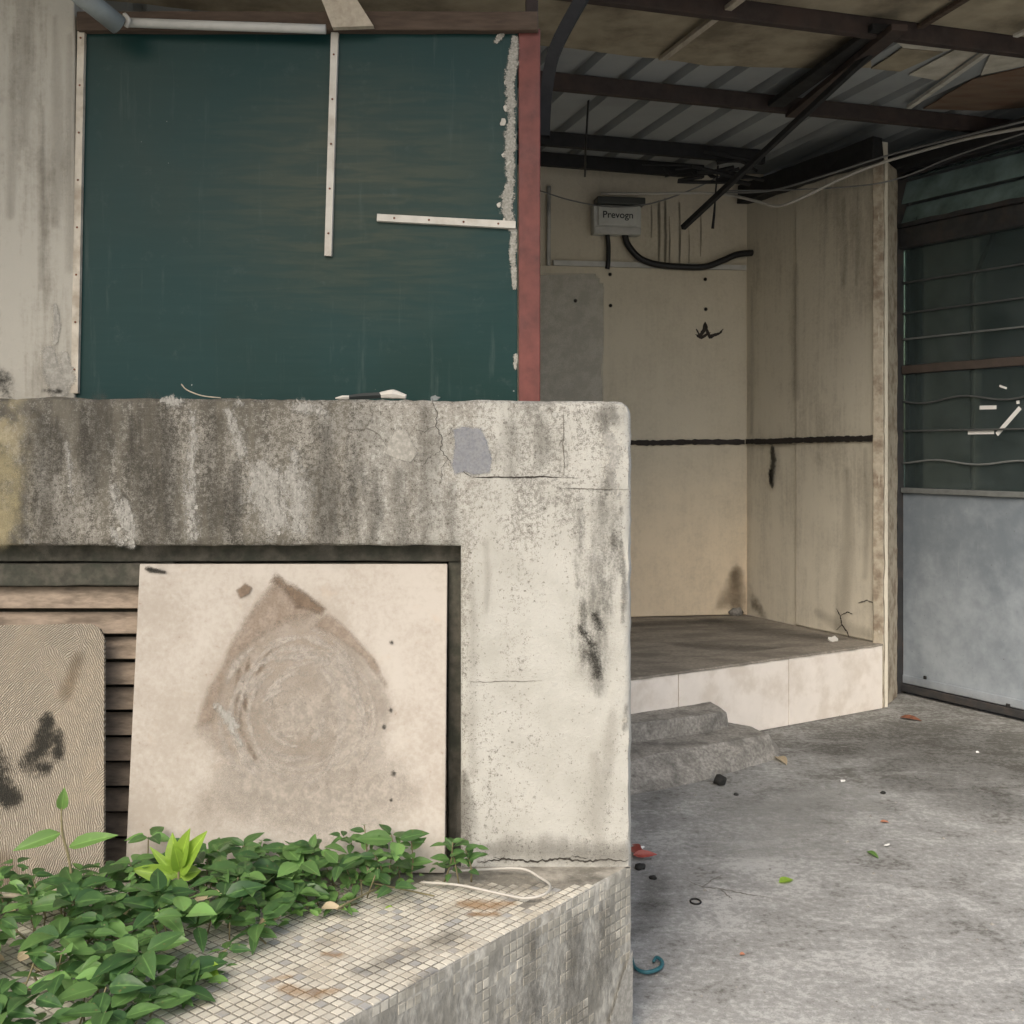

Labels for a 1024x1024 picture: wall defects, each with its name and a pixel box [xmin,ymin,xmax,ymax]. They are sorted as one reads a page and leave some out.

peeling [494,33,519,290]
crack [416,399,626,491]
crack [836,600,873,638]
crack [478,855,626,863]